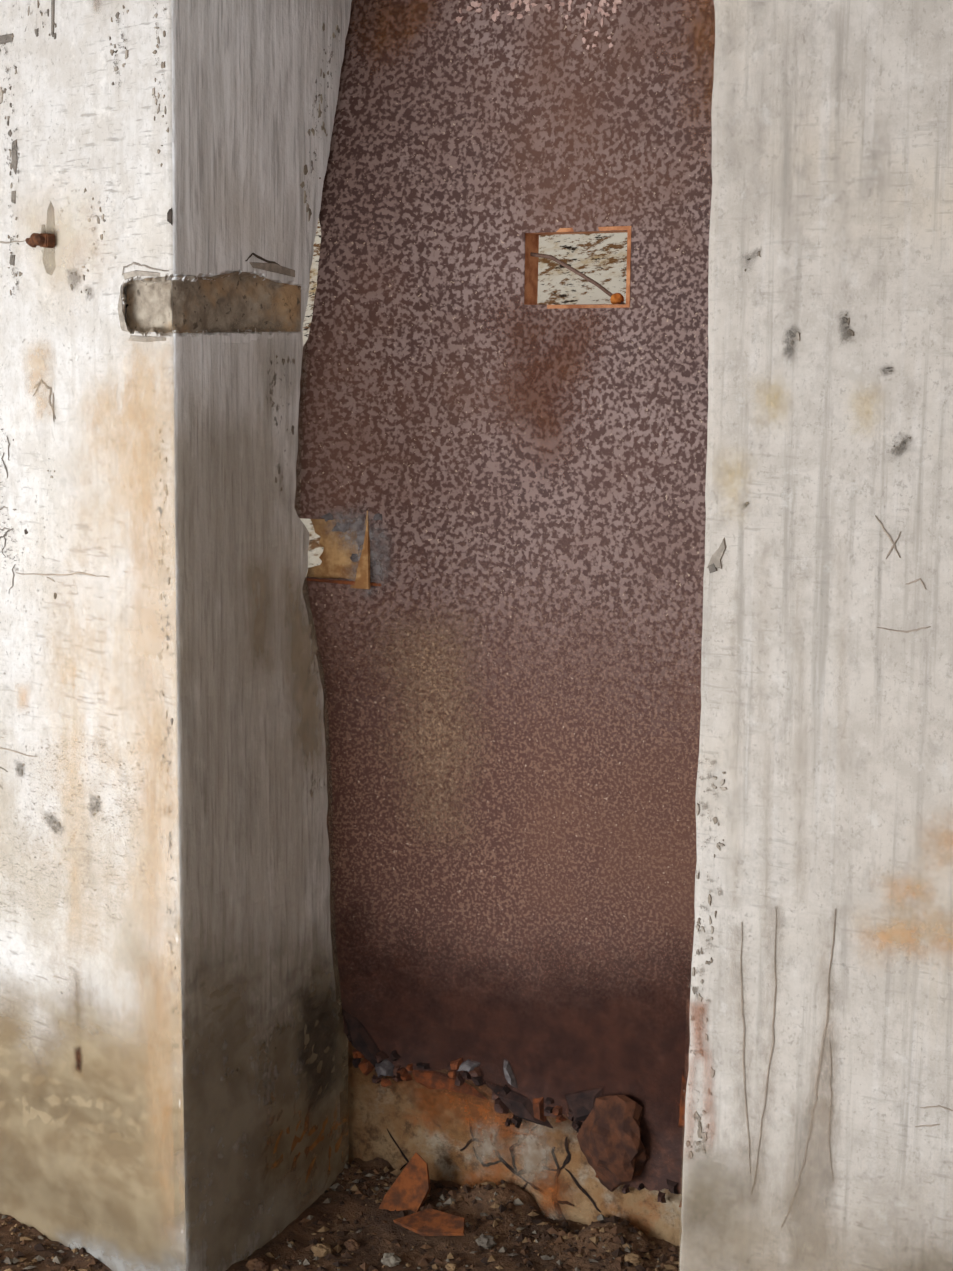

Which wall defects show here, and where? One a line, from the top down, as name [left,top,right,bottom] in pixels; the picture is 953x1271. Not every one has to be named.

crack [33,379,56,421]
crack [0,437,108,590]
crack [0,737,37,789]
water stain [0,953,349,1271]
corrosion [346,1033,649,1194]
corrosion [678,1075,687,1130]
corrosion [657,1179,682,1207]